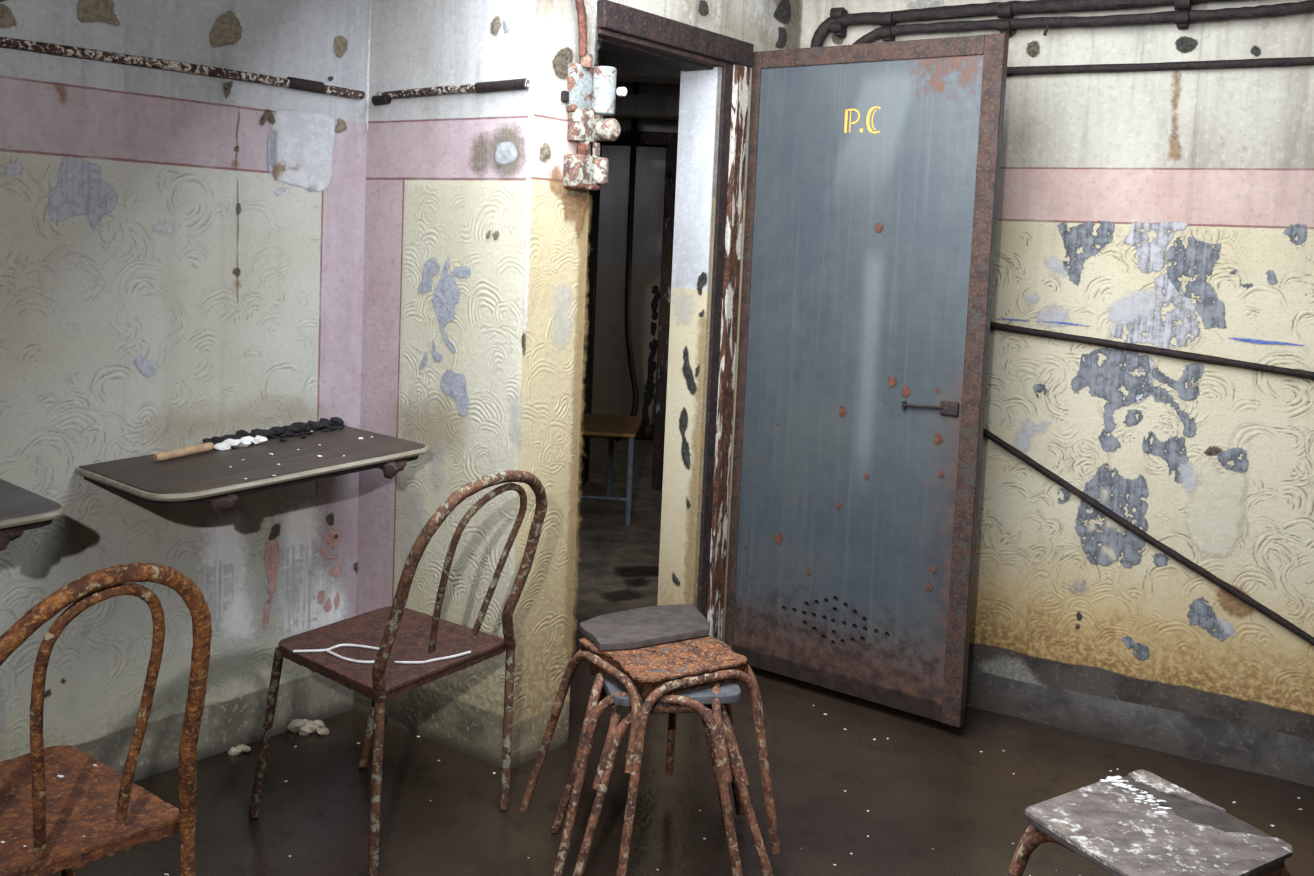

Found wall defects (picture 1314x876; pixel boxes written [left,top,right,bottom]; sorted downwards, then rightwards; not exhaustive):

spalling [77,0,119,26]
rust [552,47,574,79]
rust [595,28,726,67]
rust [1169,72,1180,159]
peeling [417,257,471,416]
spalling [697,272,707,317]
spalling [679,346,700,469]
peeling [1046,221,1226,568]
peeling [1204,446,1248,473]
water stain [199,510,255,641]
water stain [277,501,348,638]
water stain [981,656,1040,685]